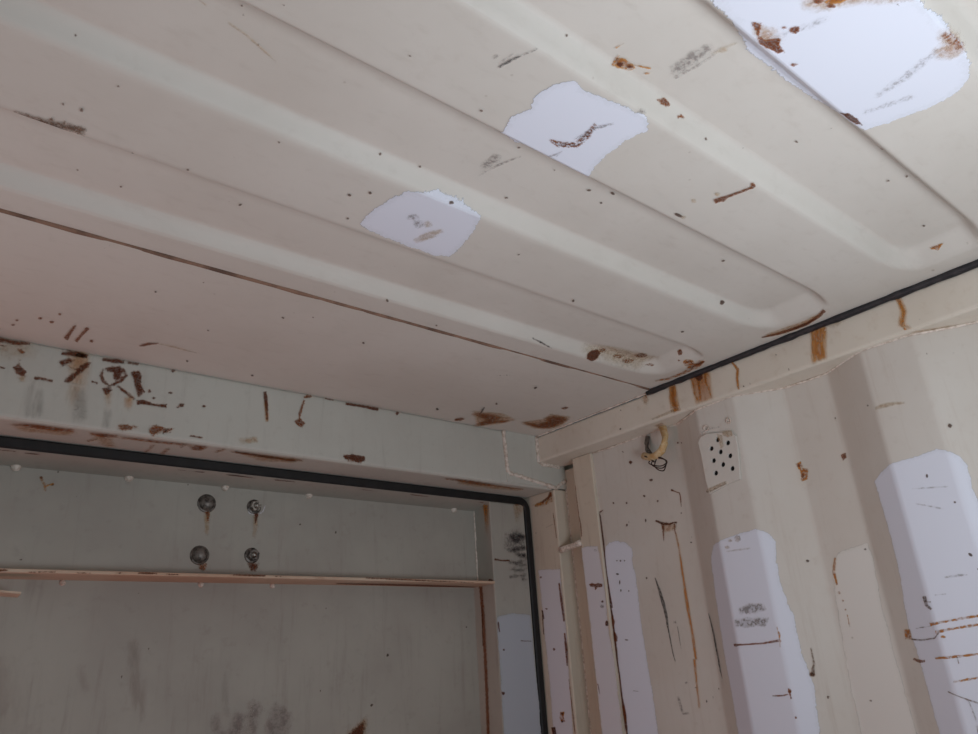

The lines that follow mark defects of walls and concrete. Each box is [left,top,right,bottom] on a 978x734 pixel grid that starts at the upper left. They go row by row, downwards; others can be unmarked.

rust [814,0,845,8]
rust [0,337,53,382]
rust [59,325,93,383]
rust [92,358,184,408]
rust [587,348,654,366]
rust [660,349,711,412]
rust [475,403,507,426]
rust [525,407,568,429]
rust [645,519,707,702]
rust [345,577,493,734]
peeling [833,543,917,734]